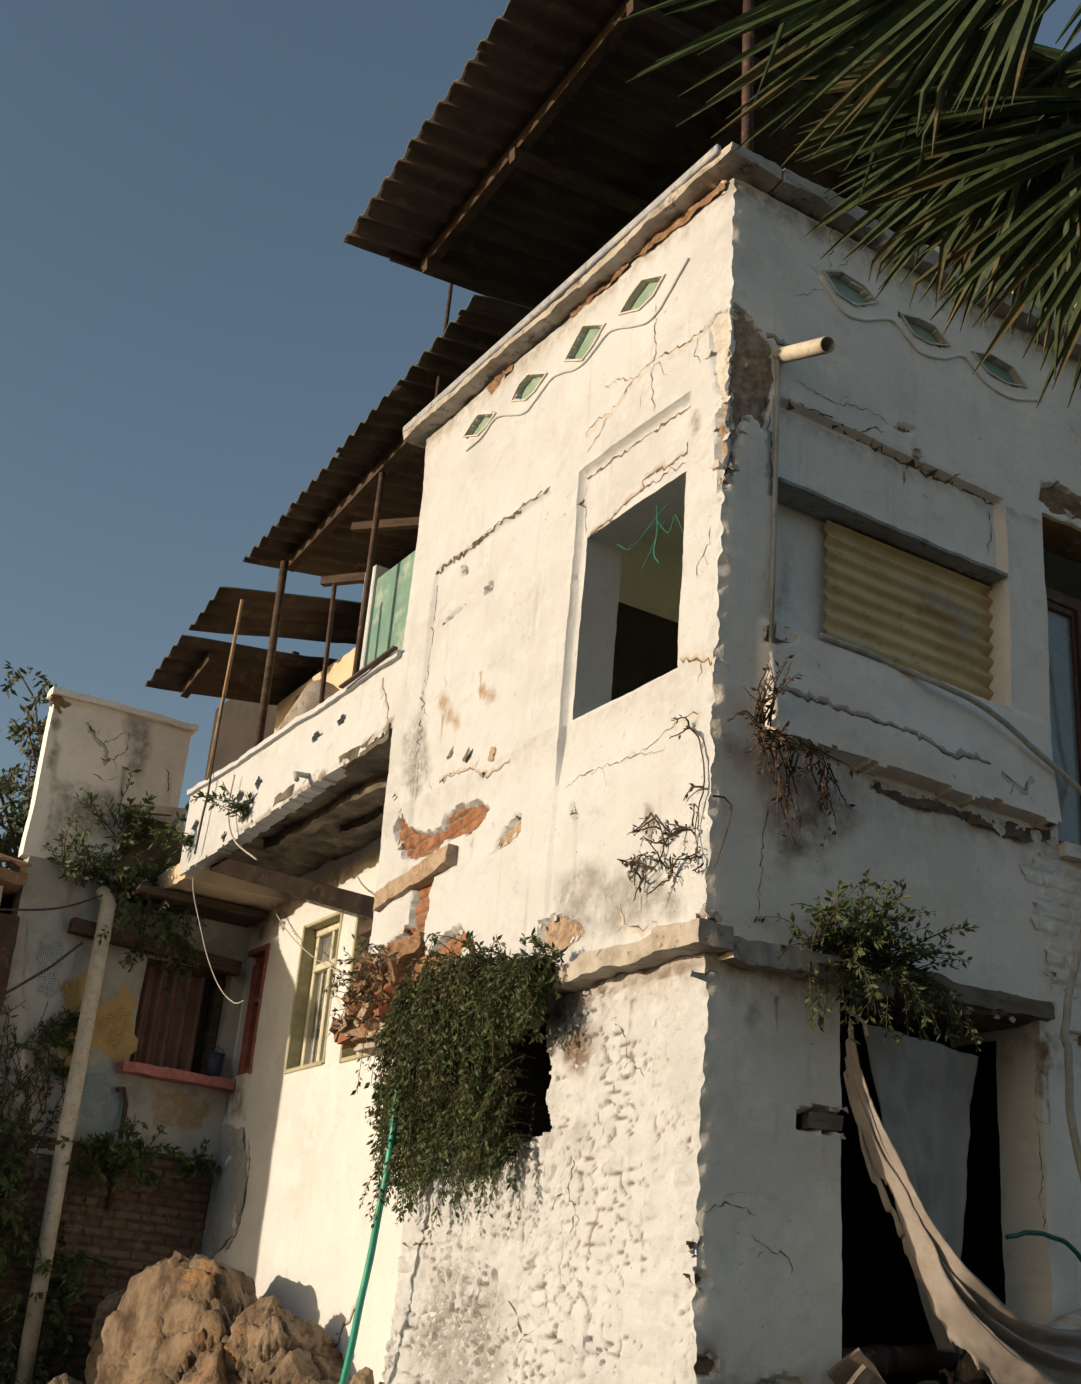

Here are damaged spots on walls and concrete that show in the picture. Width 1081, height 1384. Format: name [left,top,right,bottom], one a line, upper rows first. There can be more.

crack [578,302,792,537]
spalling [704,311,774,485]
crack [762,381,994,552]
spalling [1039,486,1081,520]
crack [380,487,550,793]
crack [85,722,129,781]
crack [566,650,716,790]
spalling [391,793,489,859]
spalling [871,780,1056,845]
spalling [386,883,470,988]
spalling [538,915,585,954]
peeling [694,1353,718,1374]